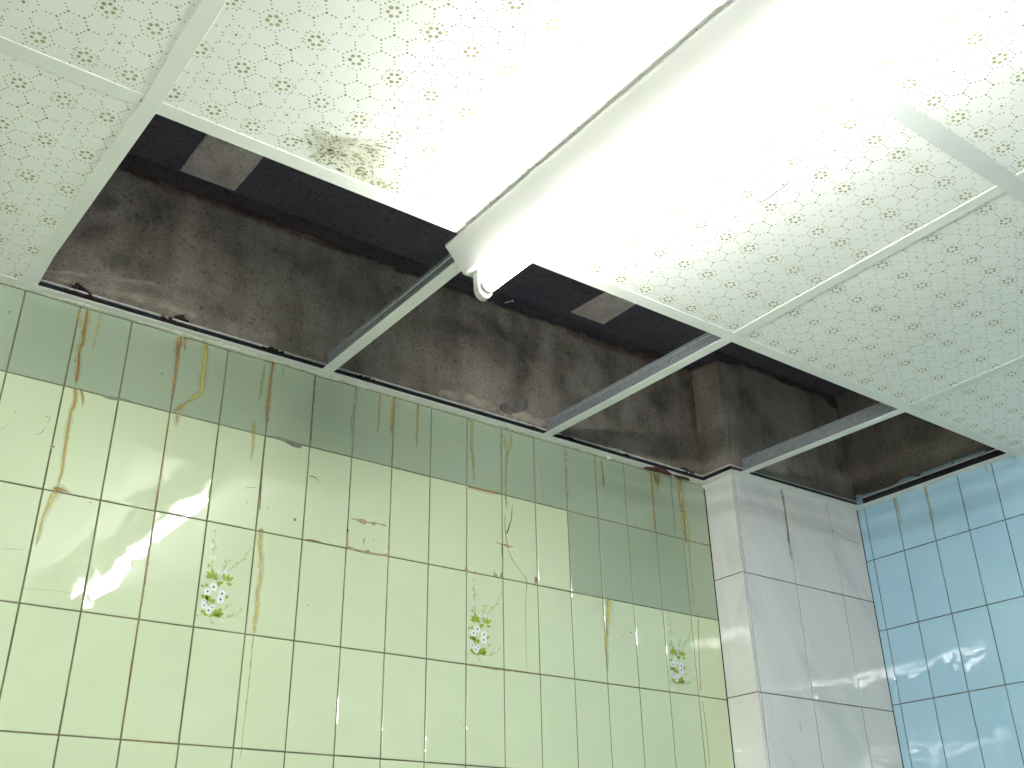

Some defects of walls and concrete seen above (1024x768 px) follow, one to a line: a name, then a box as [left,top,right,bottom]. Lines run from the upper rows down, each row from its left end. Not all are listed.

water stain [295,121,417,194]
rust [37,310,88,541]
rust [172,337,207,419]
spalling [266,436,303,448]
spalling [499,400,529,414]
spalling [602,446,690,481]
spalling [855,450,988,501]
rust [254,531,262,630]